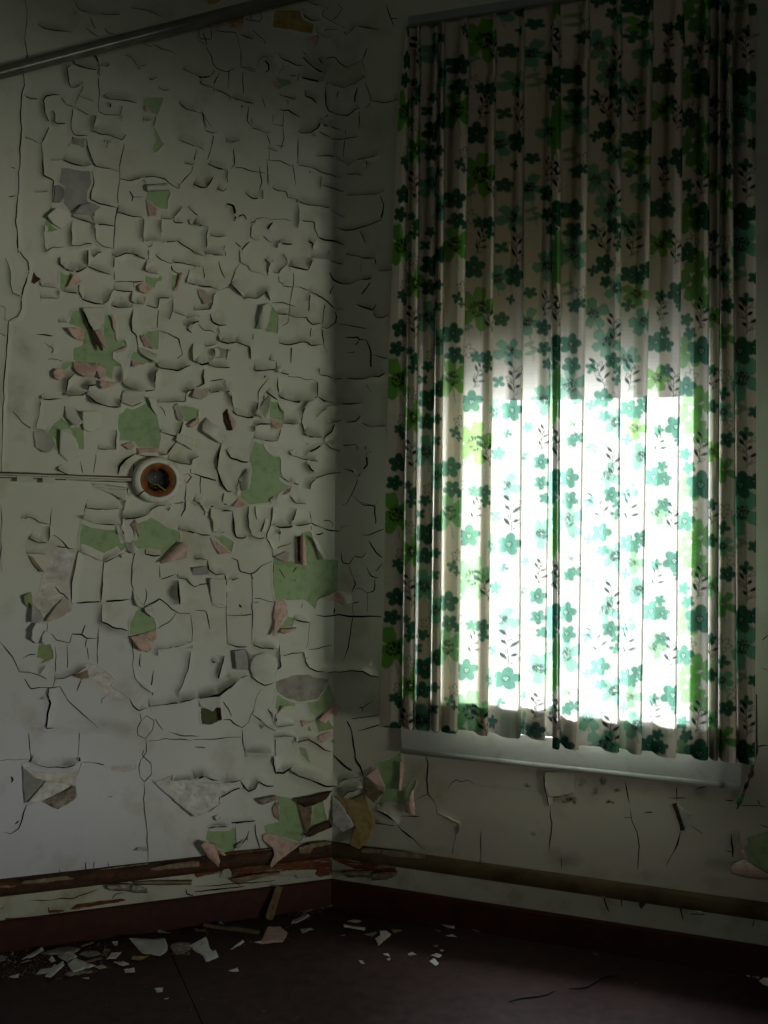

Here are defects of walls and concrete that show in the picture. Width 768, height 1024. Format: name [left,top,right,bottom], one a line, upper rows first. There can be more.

peeling [33,406,102,461]
peeling [53,307,163,455]
crack [0,0,481,853]
peeling [24,517,209,664]
peeling [270,528,353,637]
peeling [235,649,341,751]
peeling [20,761,84,809]
peeling [96,750,425,893]
crack [539,770,570,869]
crack [625,782,653,870]
crack [28,862,124,912]
crack [185,880,275,896]